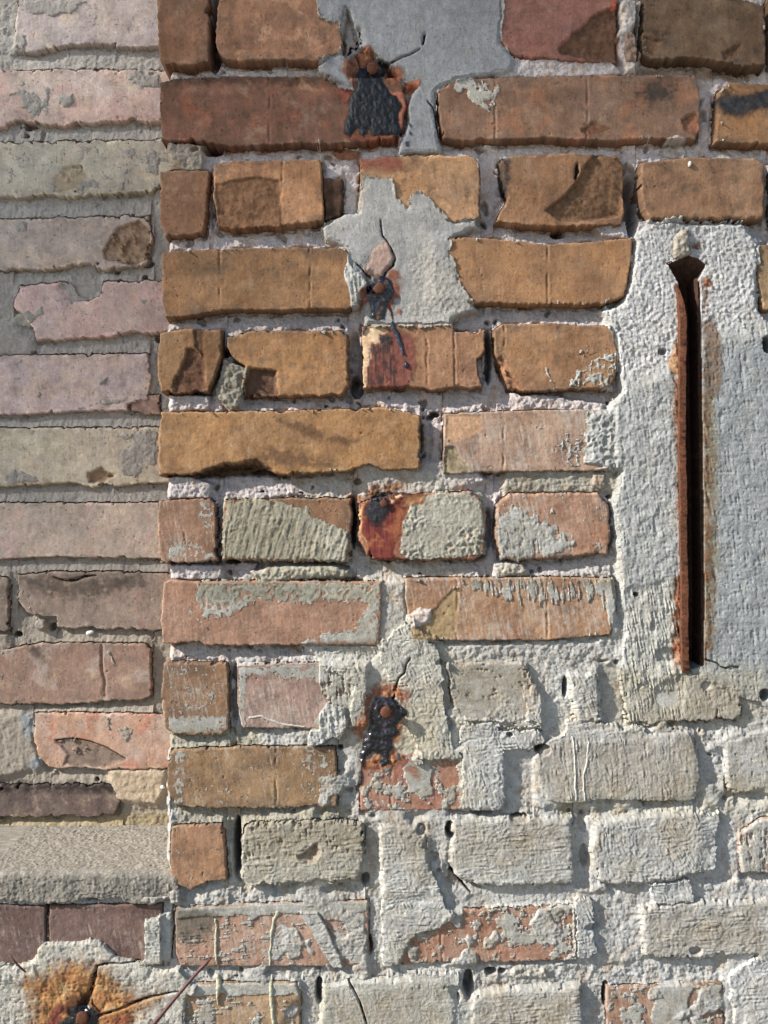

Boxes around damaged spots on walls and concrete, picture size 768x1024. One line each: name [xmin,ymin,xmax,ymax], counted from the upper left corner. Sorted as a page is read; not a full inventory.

rust [337,55,420,170]
peeling [344,256,368,312]
rust [359,242,416,392]
rust [349,483,425,560]
rust [669,341,679,519]
rust [701,370,713,583]
spalling [411,589,458,640]
rust [671,576,681,666]
rust [352,685,418,792]
rust [23,962,161,1024]